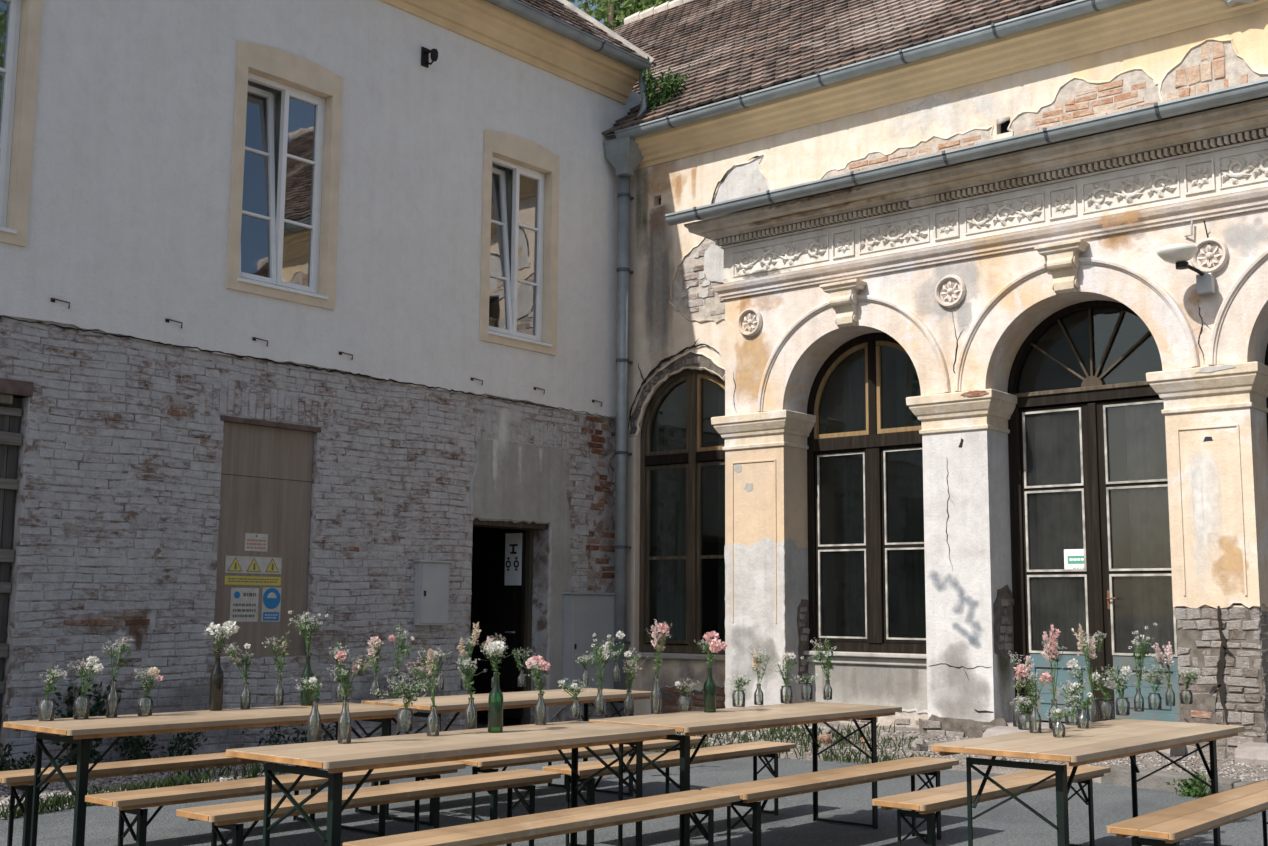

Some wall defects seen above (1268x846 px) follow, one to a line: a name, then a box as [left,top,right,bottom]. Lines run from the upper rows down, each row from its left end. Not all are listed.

spalling [814,38,1268,181]
peeling [713,154,772,203]
spalling [669,238,725,324]
crack [1197,300,1208,359]
crack [946,469,955,565]